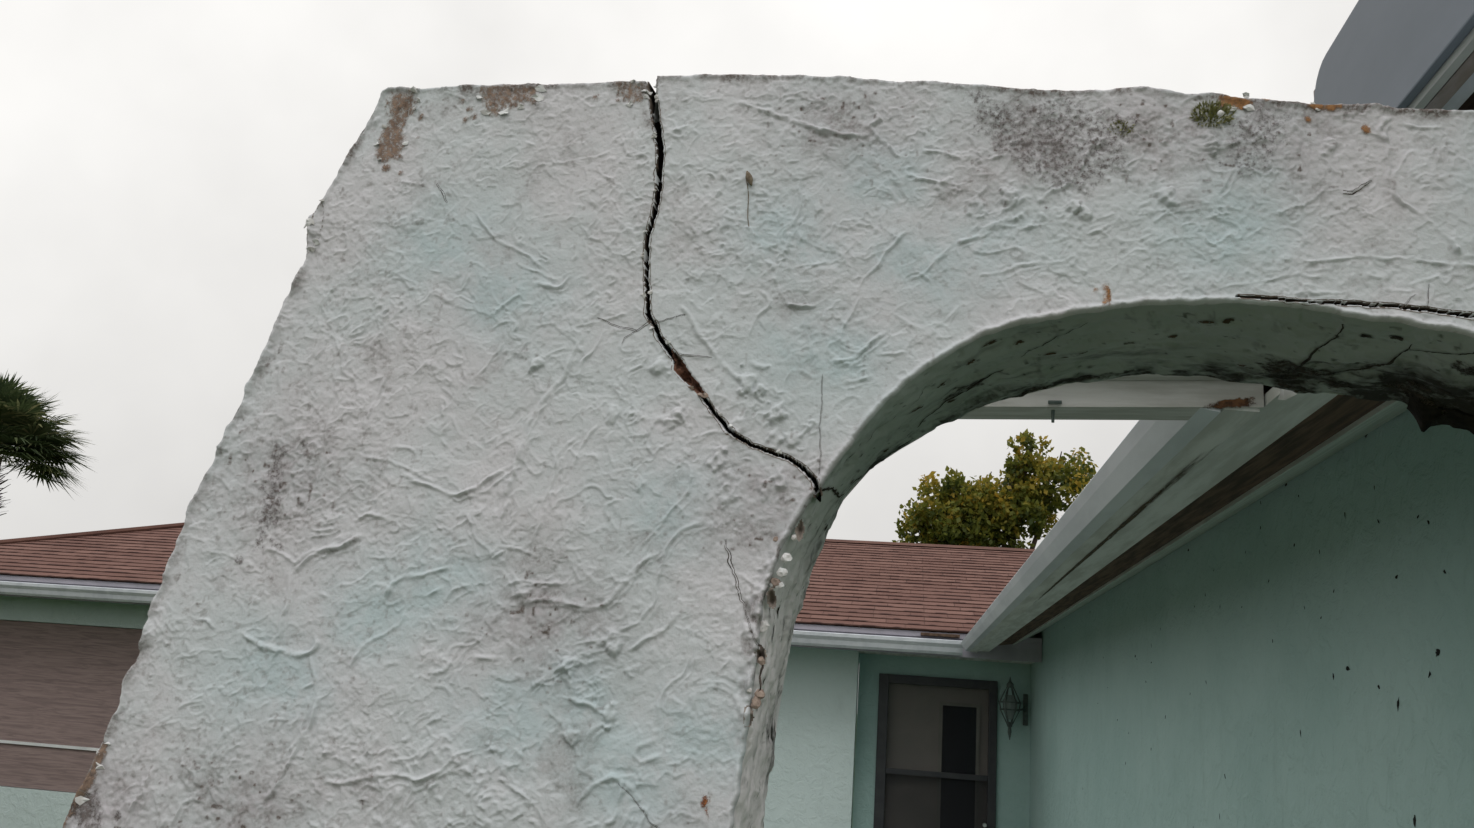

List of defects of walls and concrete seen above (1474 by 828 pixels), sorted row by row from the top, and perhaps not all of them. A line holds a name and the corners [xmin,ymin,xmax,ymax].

peeling [374,86,424,175]
crack [597,79,863,502]
damp [909,339,1024,414]
crack [869,323,1087,440]
damp [1194,358,1357,393]
crack [1237,289,1474,376]
damp [1452,360,1474,376]